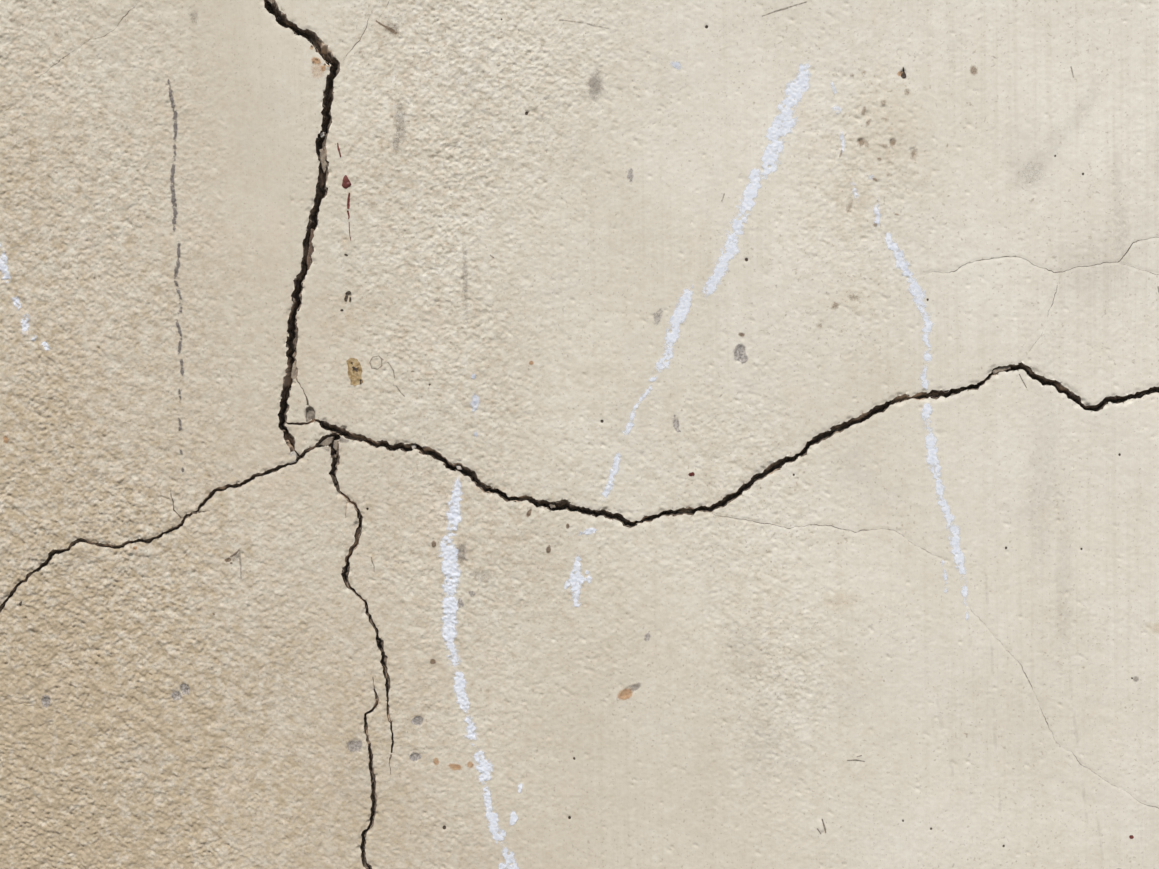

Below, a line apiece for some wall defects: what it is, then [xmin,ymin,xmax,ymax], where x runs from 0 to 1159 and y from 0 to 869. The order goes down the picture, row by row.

crack [949,240,1139,306]
crack [0,0,394,774]
crack [314,362,1159,528]
crack [360,679,379,869]